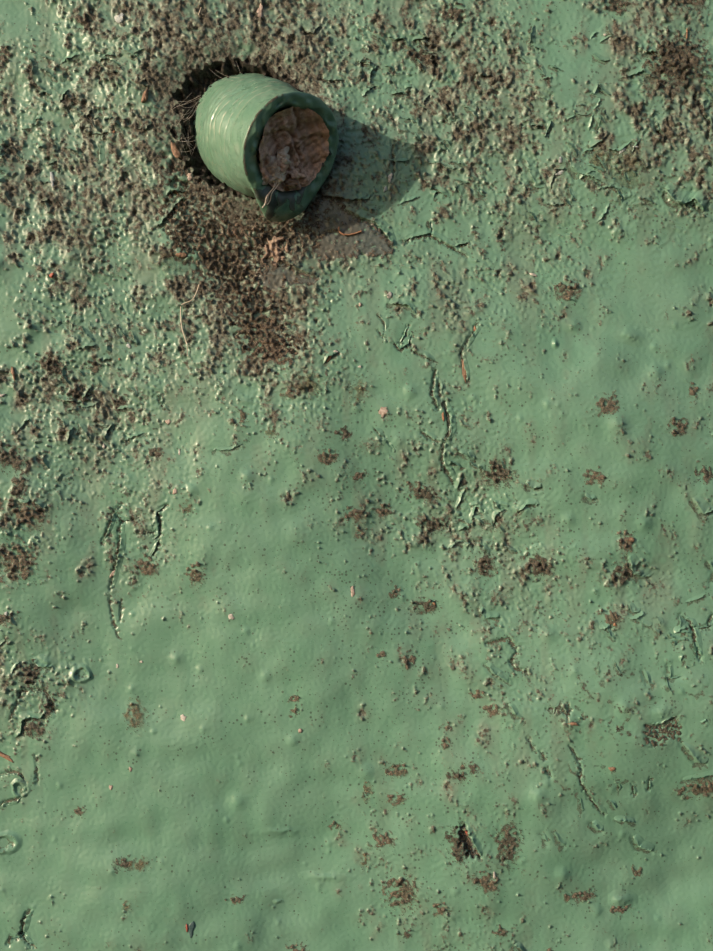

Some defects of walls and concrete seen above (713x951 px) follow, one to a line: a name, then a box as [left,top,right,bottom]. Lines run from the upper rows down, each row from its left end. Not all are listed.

peeling [26,45,153,164]
peeling [357,26,436,148]
peeling [544,83,650,222]
spalling [152,53,409,375]
crack [402,220,469,257]
peeling [49,362,116,449]
peeling [447,449,542,556]
crack [101,503,167,639]
peeling [630,611,699,690]
peeling [14,709,49,740]
peeling [642,716,682,747]
peeling [459,821,483,859]